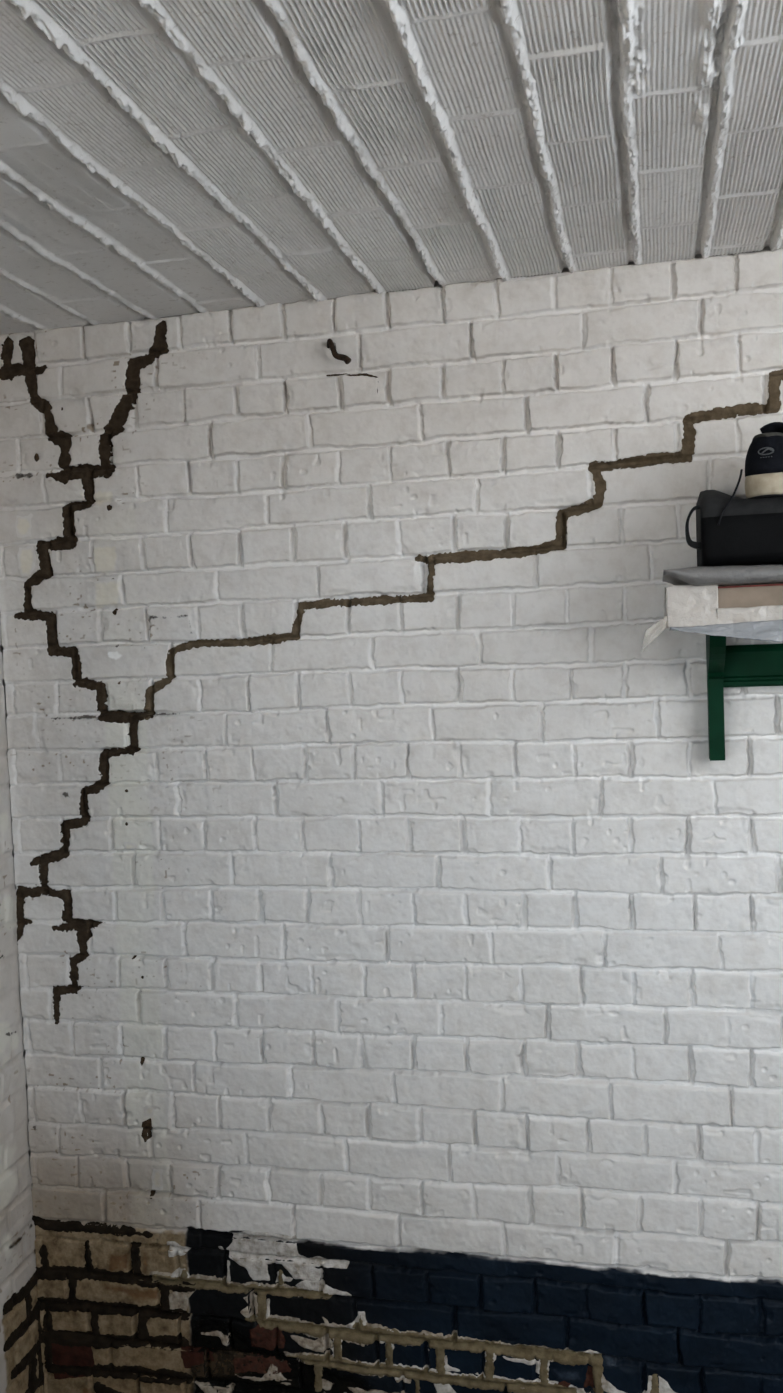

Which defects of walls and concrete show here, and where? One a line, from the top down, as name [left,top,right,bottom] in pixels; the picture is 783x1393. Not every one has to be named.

crack [0,320,783,1024]
peeling [149,1230,626,1393]
peeling [643,1376,676,1393]